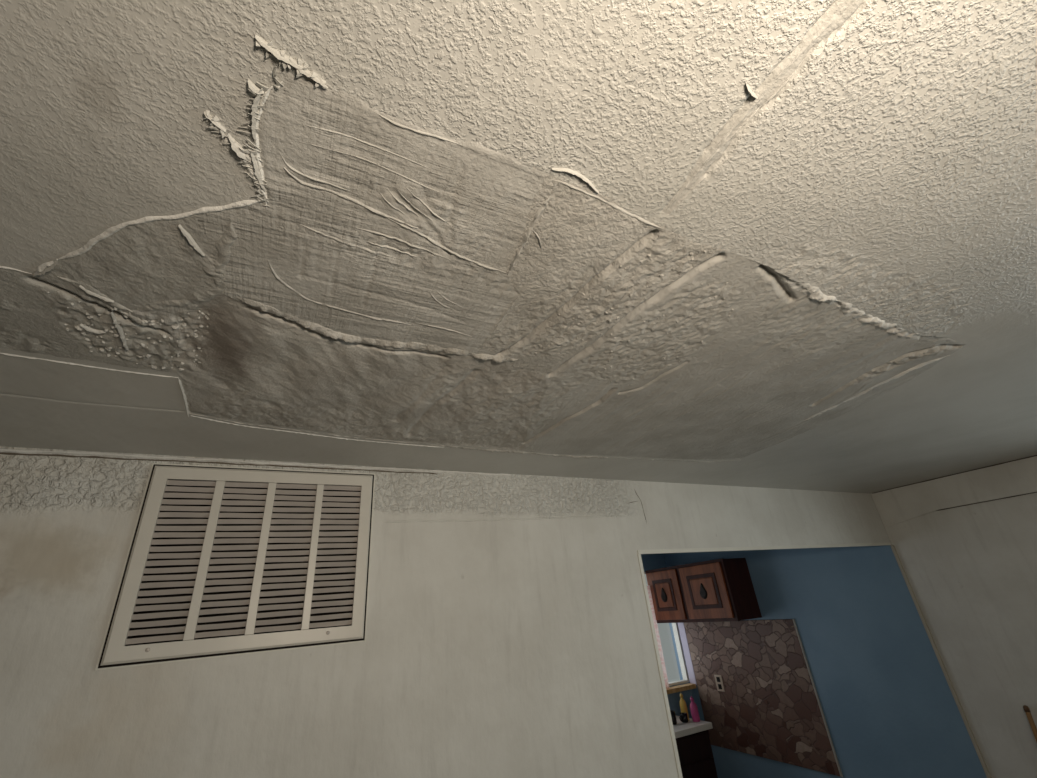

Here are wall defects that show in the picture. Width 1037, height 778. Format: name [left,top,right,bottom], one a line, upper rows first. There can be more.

spalling [0,35,662,417]
crack [510,222,722,376]
peeling [524,249,966,462]
crack [803,343,966,421]